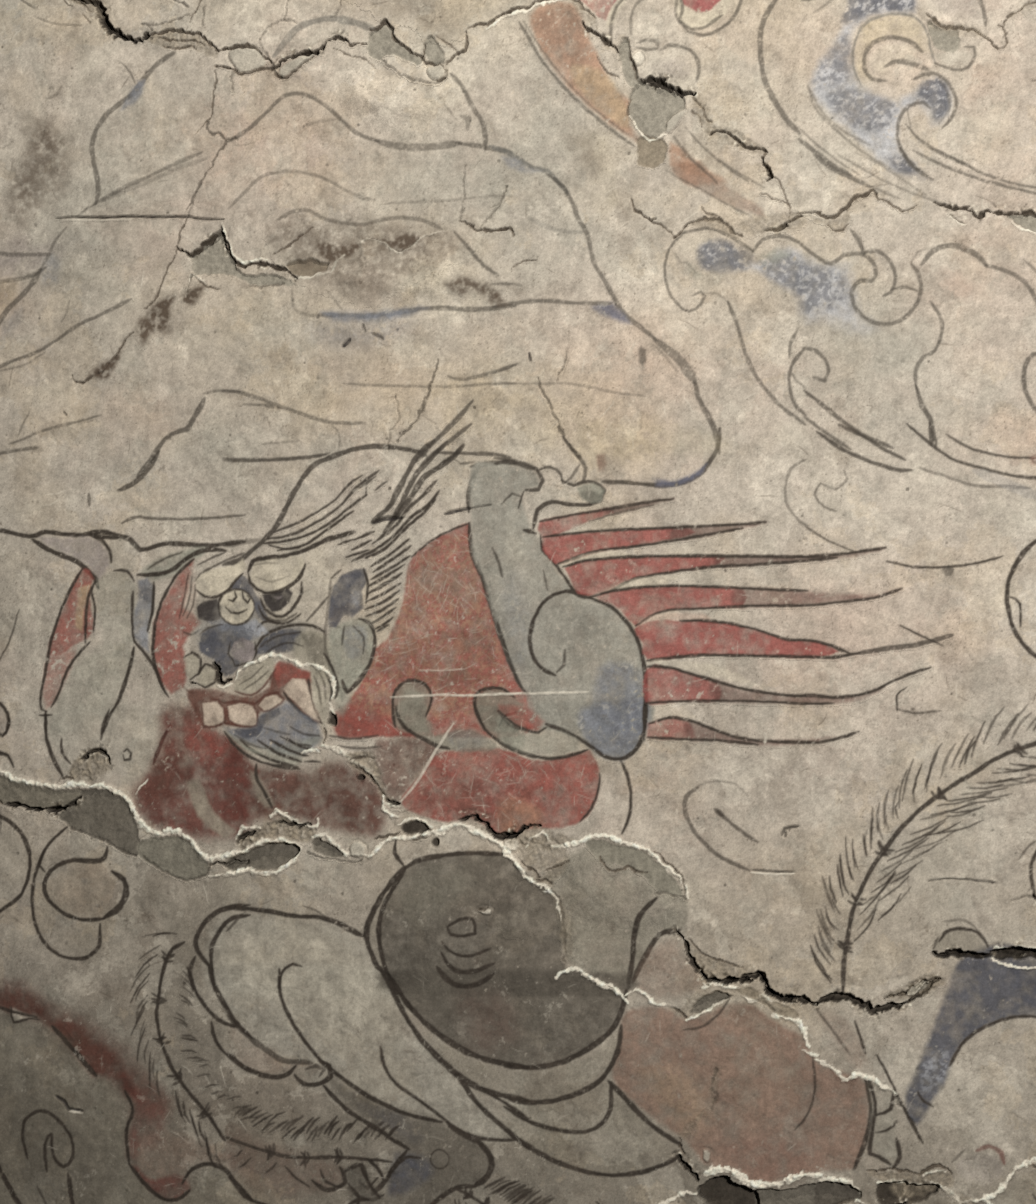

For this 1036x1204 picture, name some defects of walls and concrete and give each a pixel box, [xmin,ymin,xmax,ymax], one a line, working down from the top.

crack [466,0,1036,242]
crack [62,0,375,343]
crack [458,164,538,269]
crack [70,374,90,385]
spalling [222,806,320,877]
crack [0,651,947,1146]
crack [1009,890,1036,909]
spalling [924,938,1036,970]
spalling [657,1135,957,1204]
crack [928,1156,1036,1204]